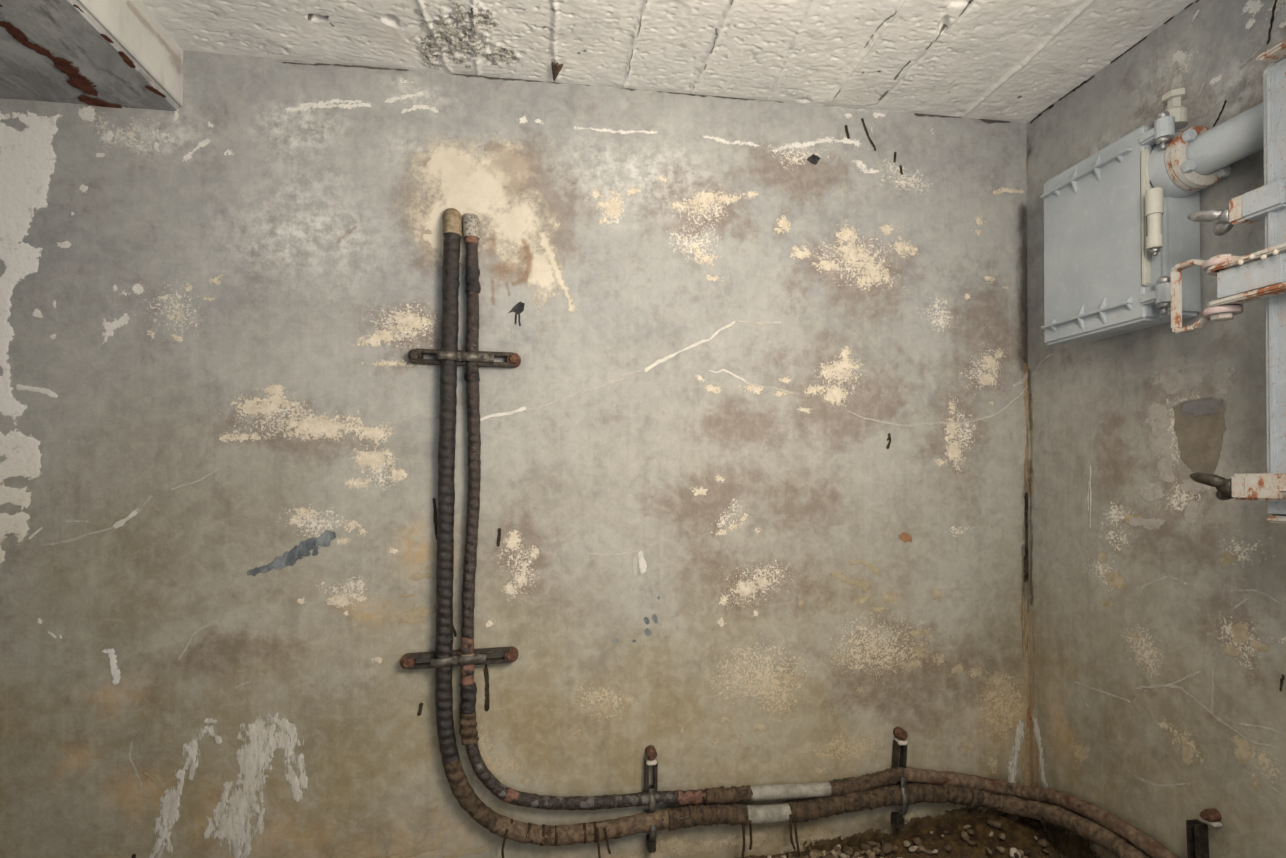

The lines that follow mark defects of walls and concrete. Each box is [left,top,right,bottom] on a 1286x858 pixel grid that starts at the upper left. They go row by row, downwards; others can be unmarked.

corrosion [0,4,122,108]
corrosion [100,34,136,68]
peeling [285,78,440,114]
spalling [410,1,522,68]
crack [835,0,974,174]
peeling [0,106,114,567]